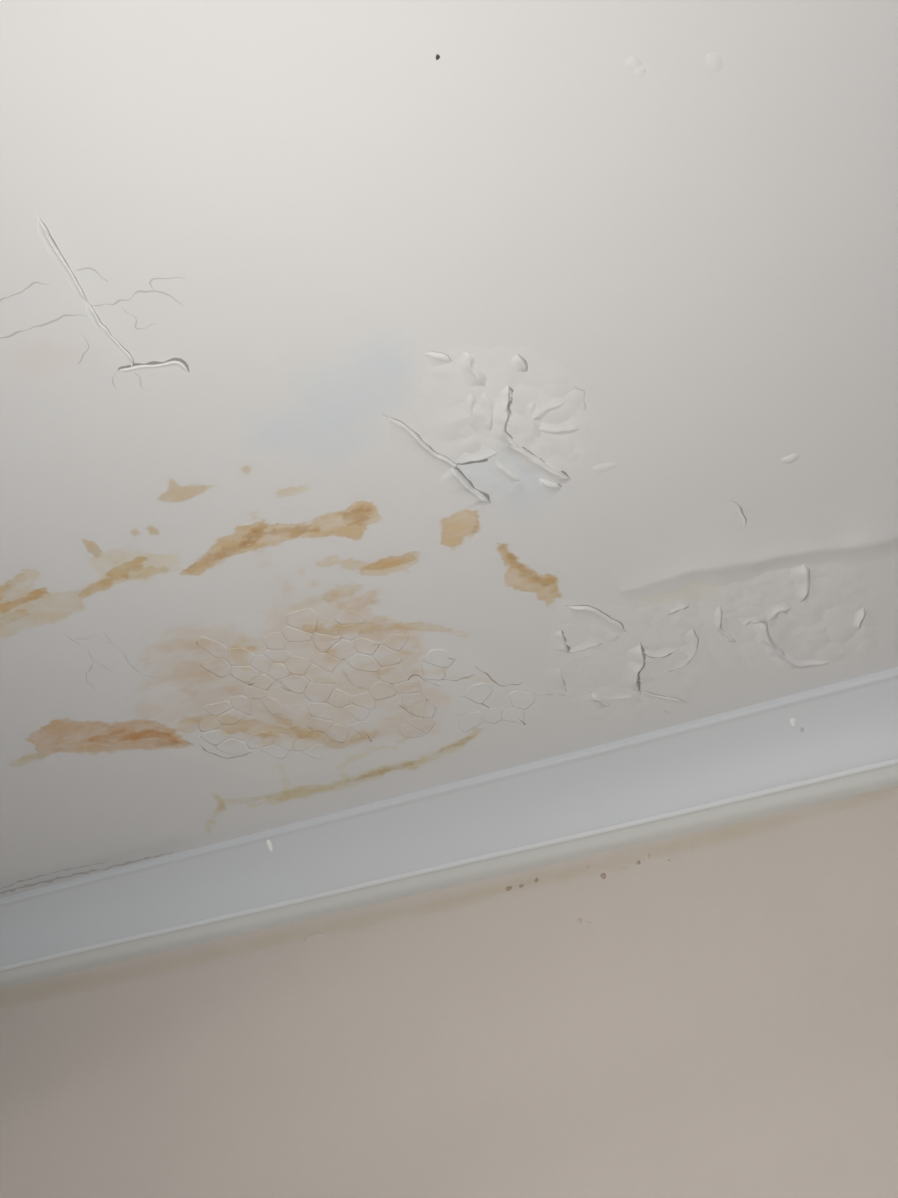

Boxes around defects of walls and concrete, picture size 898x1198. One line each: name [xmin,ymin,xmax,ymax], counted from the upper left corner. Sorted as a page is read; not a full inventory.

crack [0,214,189,391]